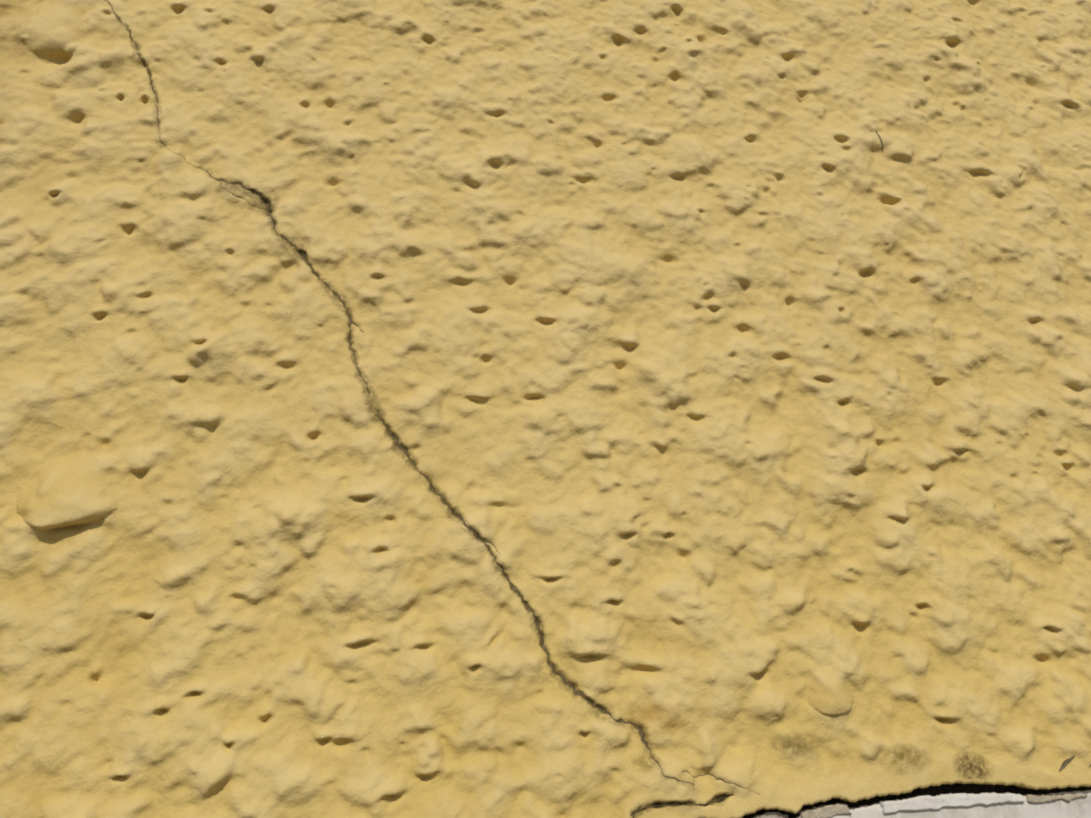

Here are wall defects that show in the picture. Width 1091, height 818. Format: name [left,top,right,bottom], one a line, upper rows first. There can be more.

crack [106,0,759,818]
peeling [799,803,851,818]
peeling [879,791,1088,814]